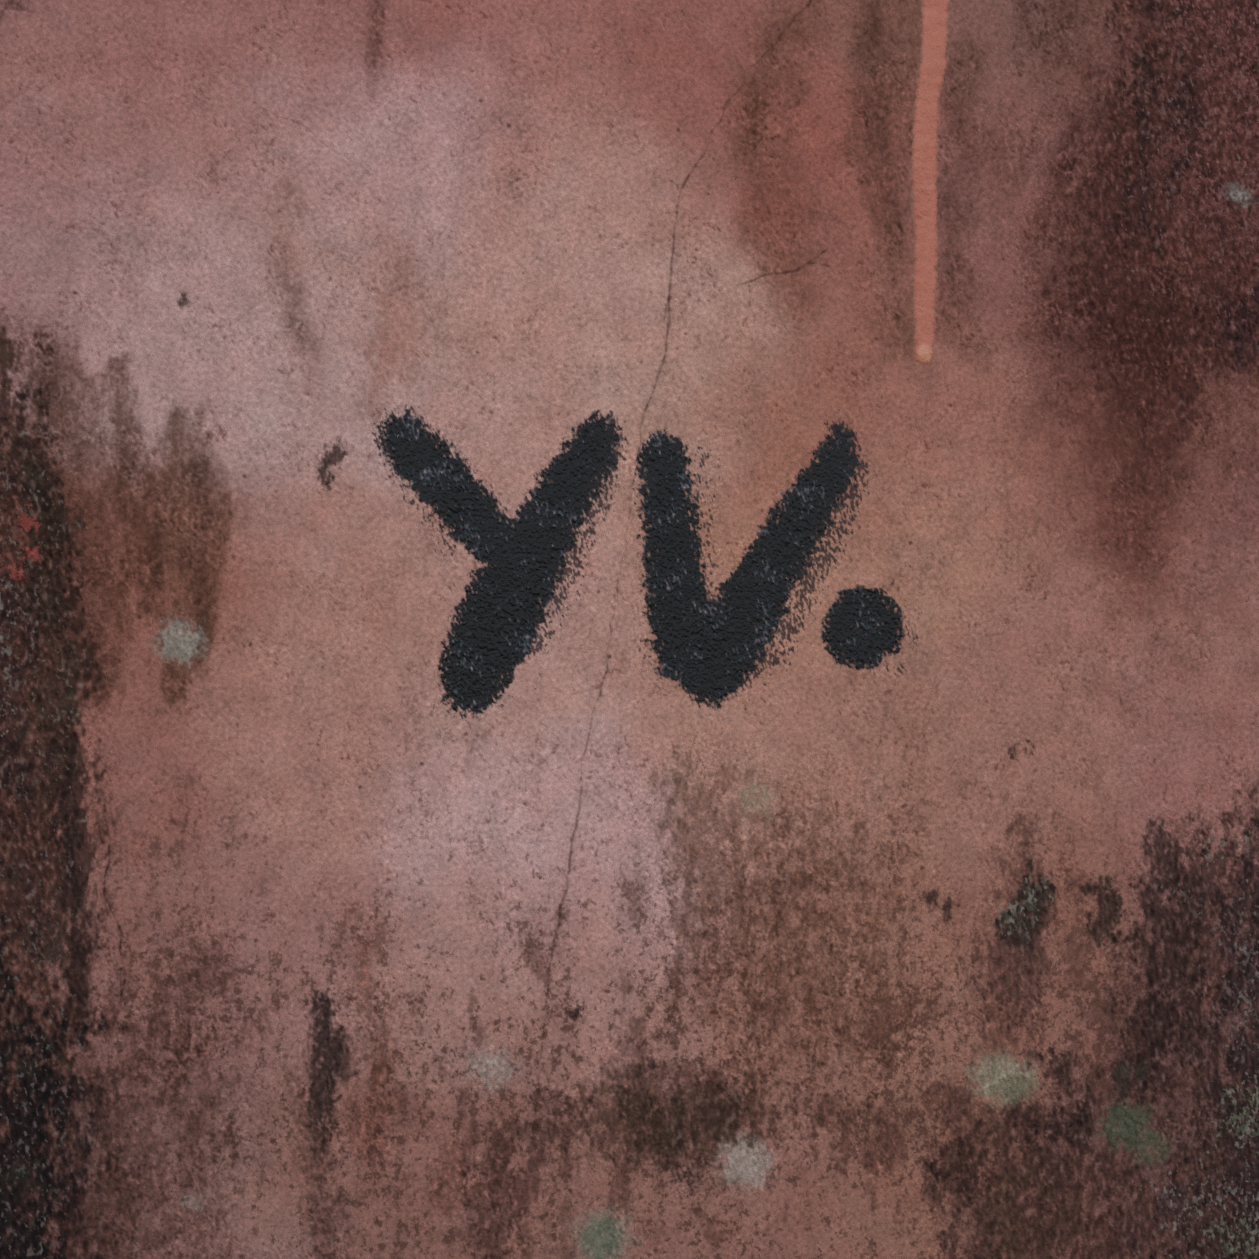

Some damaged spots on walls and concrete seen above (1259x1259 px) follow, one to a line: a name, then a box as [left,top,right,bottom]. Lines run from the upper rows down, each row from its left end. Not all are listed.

crack [638,0,813,450]
crack [736,249,834,323]
water stain [935,0,1259,672]
crack [532,495,631,1130]
water stain [0,286,1259,1259]